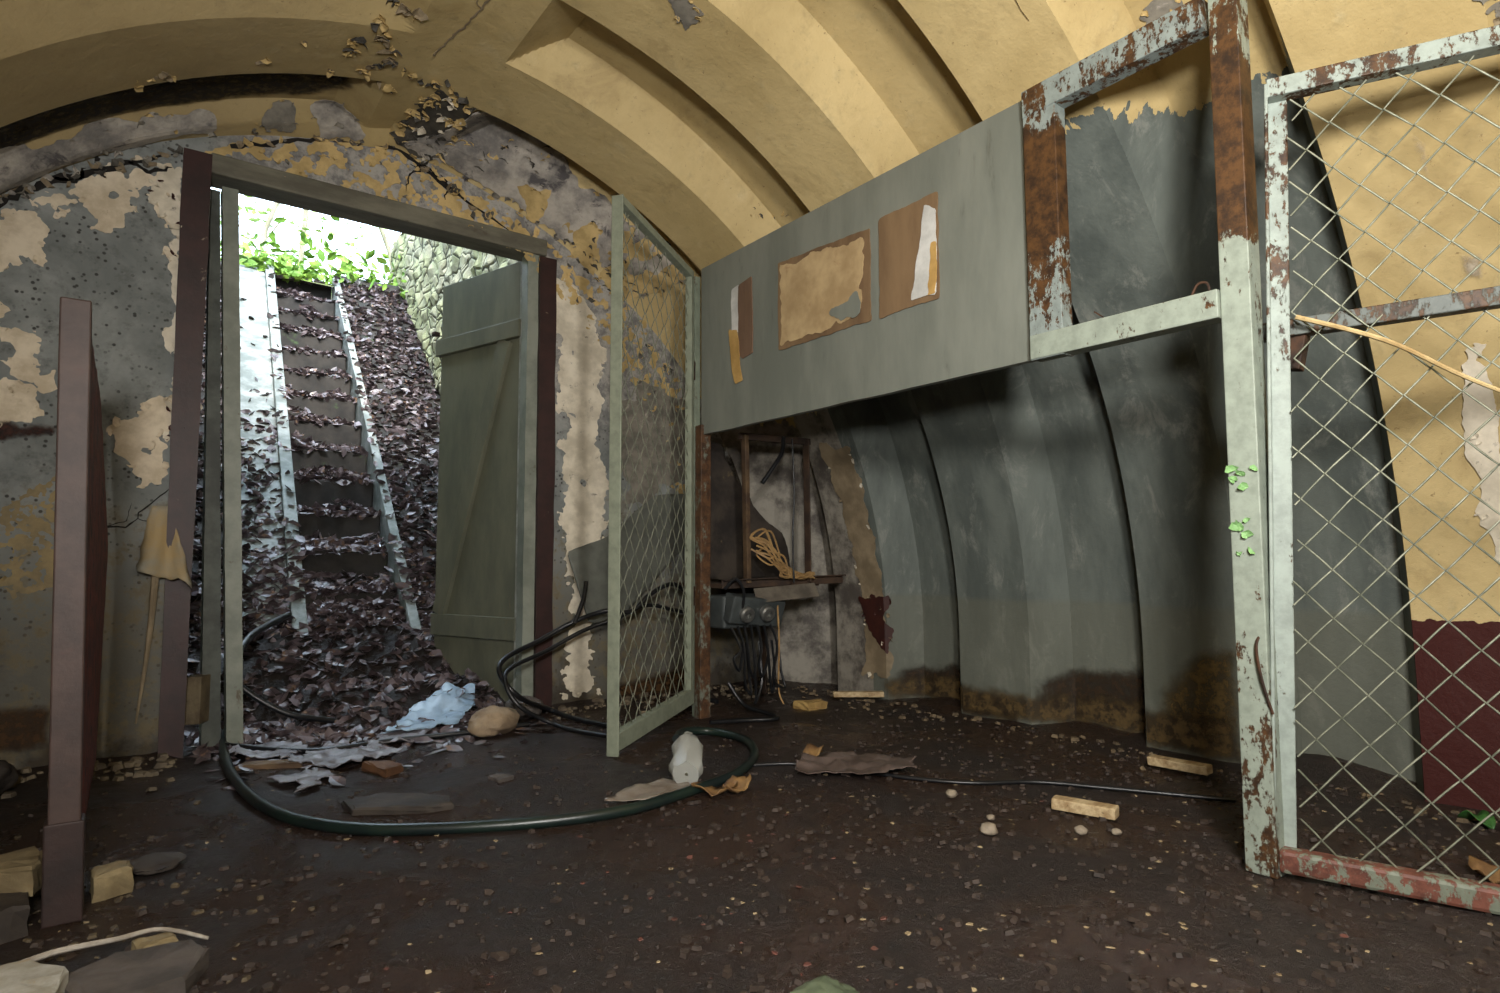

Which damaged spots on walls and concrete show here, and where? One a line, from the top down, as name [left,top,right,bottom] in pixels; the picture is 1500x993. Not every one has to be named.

crack [432,0,490,56]
peeling [668,0,704,30]
peeling [1473,0,1500,26]
peeling [0,0,685,724]
leakage [886,653,1241,760]